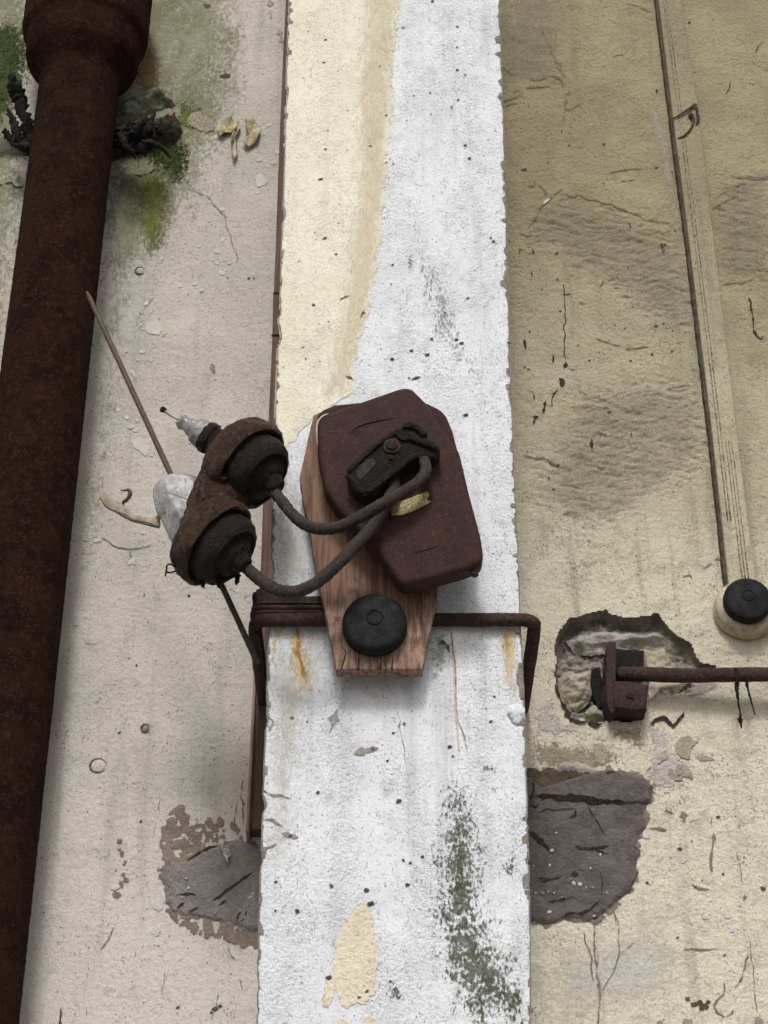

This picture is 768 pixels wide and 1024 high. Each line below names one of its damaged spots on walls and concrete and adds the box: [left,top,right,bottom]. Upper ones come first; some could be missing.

damp [137,175,168,250]
peeling [255,0,404,446]
spalling [489,1,520,612]
crack [523,284,689,515]
crack [722,267,768,340]
corrosion [273,627,311,690]
peeling [157,627,271,1024]
damp [448,834,477,915]
damp [467,981,487,1024]
damp [504,981,524,1024]
crack [529,770,634,1024]
spalling [515,609,716,1024]